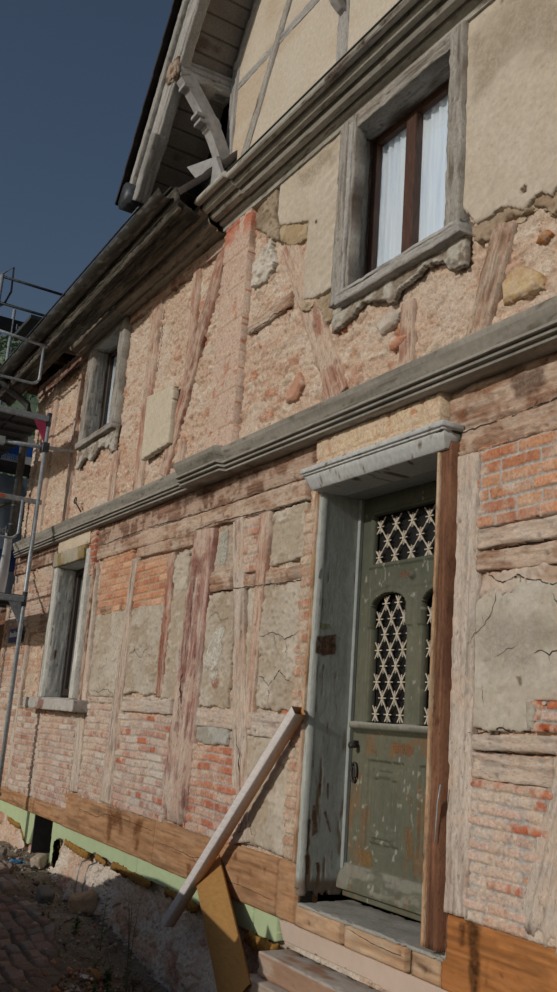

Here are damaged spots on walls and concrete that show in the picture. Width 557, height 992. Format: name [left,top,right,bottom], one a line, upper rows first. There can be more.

spalling [250,189,317,289]
spalling [471,192,557,245]
crack [470,538,557,642]
peeling [316,623,336,673]
peeling [305,805,331,874]
leakage [461,922,479,992]